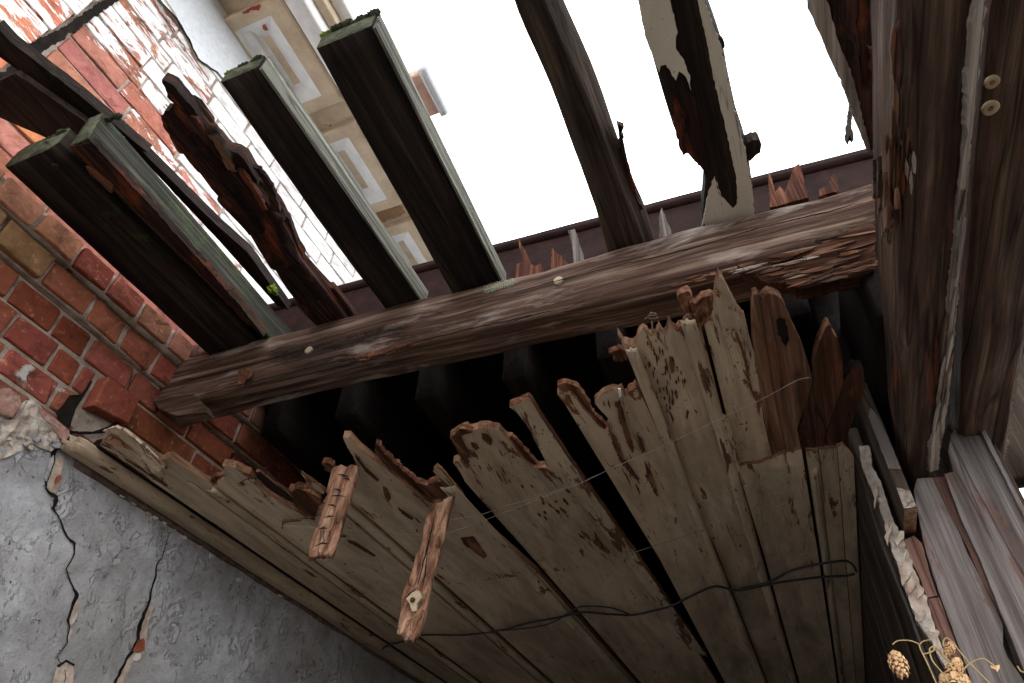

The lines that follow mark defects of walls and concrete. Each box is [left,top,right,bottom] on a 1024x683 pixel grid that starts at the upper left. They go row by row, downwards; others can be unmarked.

spalling [0,380,120,459]
crack [43,431,80,663]
crack [114,528,170,683]